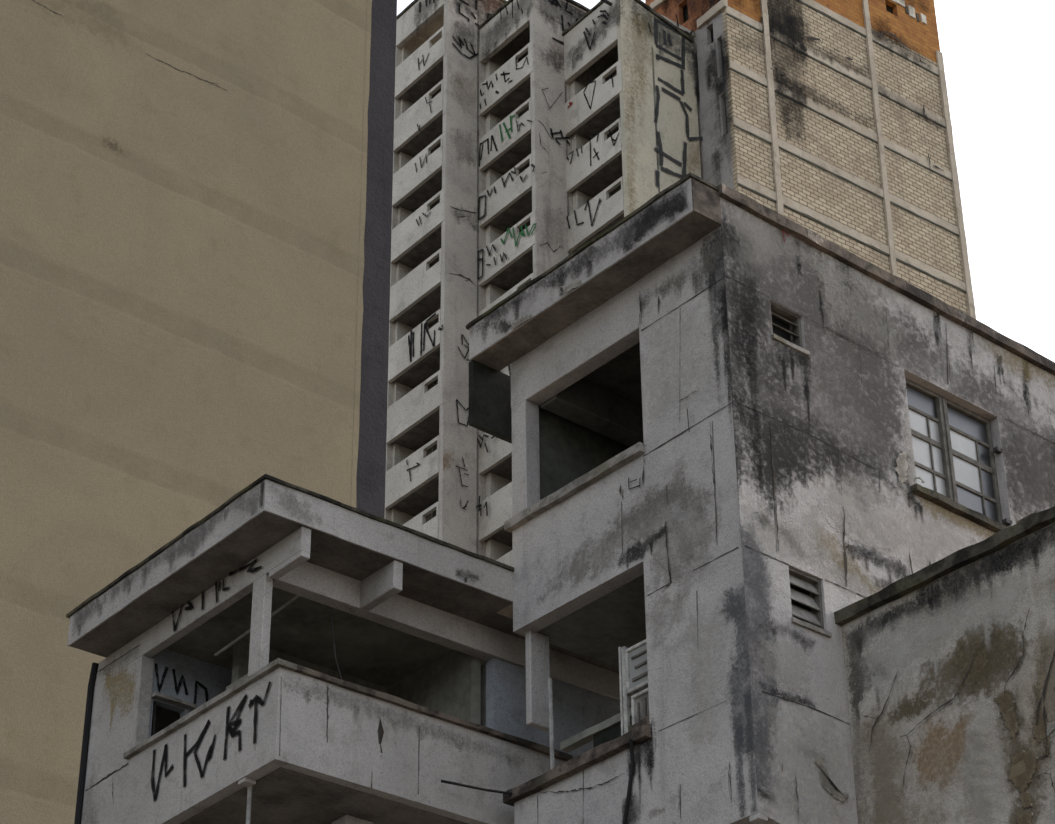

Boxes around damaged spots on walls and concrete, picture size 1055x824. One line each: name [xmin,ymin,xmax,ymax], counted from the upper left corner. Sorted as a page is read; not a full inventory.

crack [147,54,227,91]
damp [761,18,807,139]
damp [776,344,810,420]
damp [619,526,665,569]
damp [791,486,909,594]
damp [722,511,815,817]
crack [862,674,897,751]
crack [901,638,985,792]
damp [845,524,1055,824]
crack [1004,608,1030,692]
crack [1034,651,1055,791]
crack [87,763,128,798]